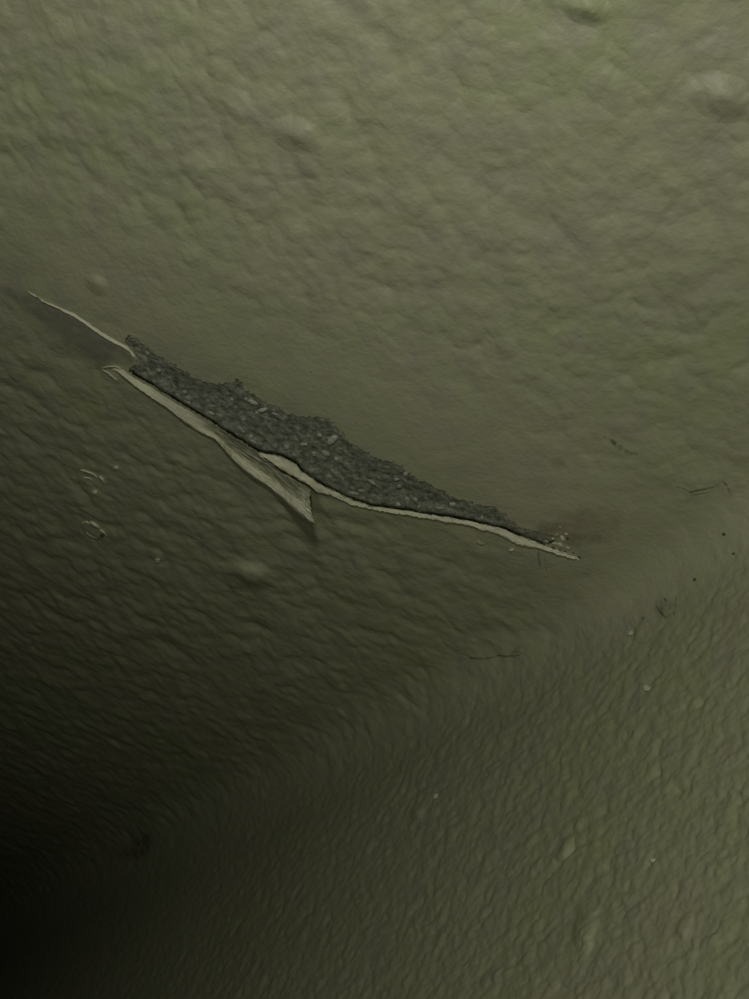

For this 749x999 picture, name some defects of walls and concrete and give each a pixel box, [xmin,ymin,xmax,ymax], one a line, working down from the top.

peeling [27,290,581,560]